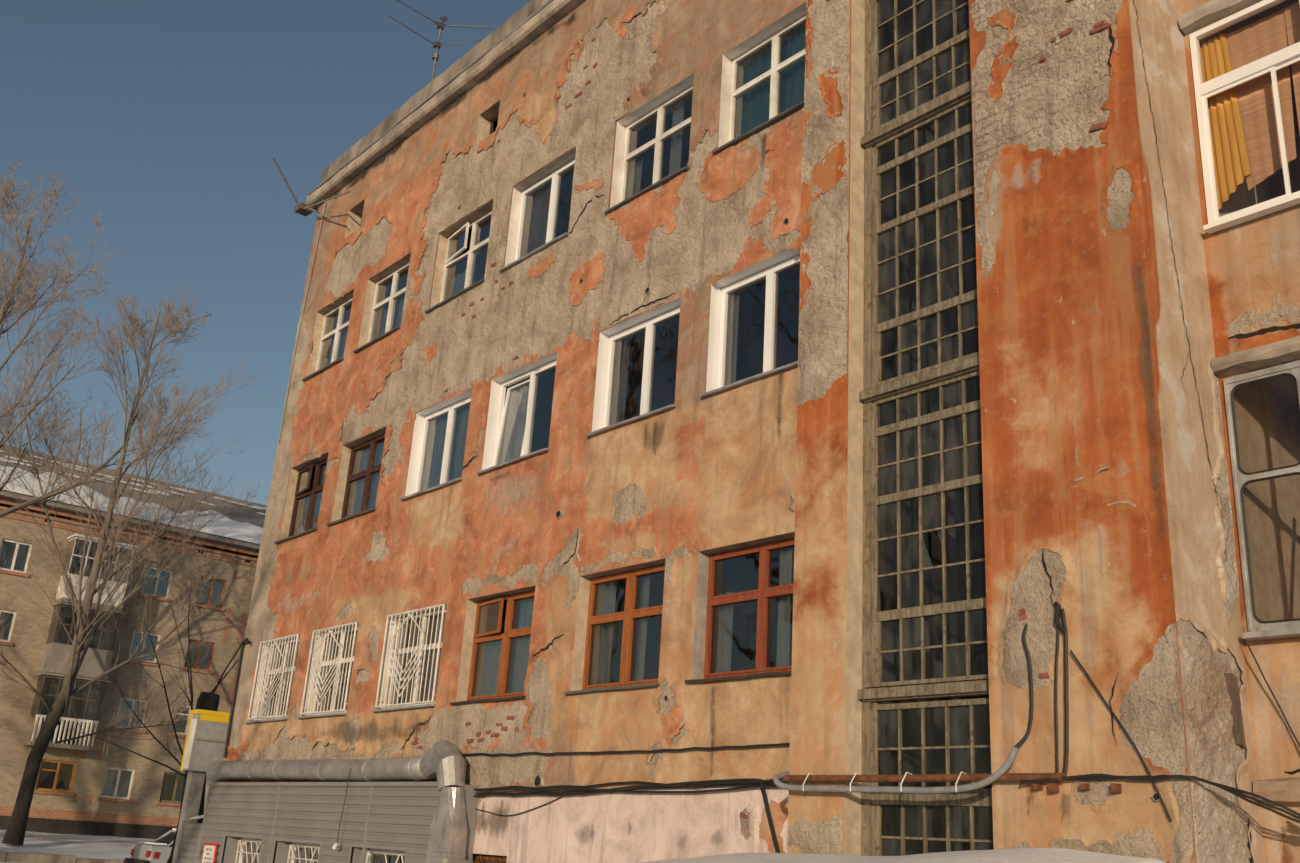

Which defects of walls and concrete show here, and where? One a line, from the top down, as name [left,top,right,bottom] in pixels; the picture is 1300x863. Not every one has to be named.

spalling [969,0,1142,279]
crack [567,195,605,237]
crack [1107,1,1222,508]
crack [1228,321,1300,339]
spalling [227,0,850,806]
crack [532,633,564,656]
crack [1042,553,1055,610]
peeling [996,355,1257,863]
crack [1109,673,1118,744]